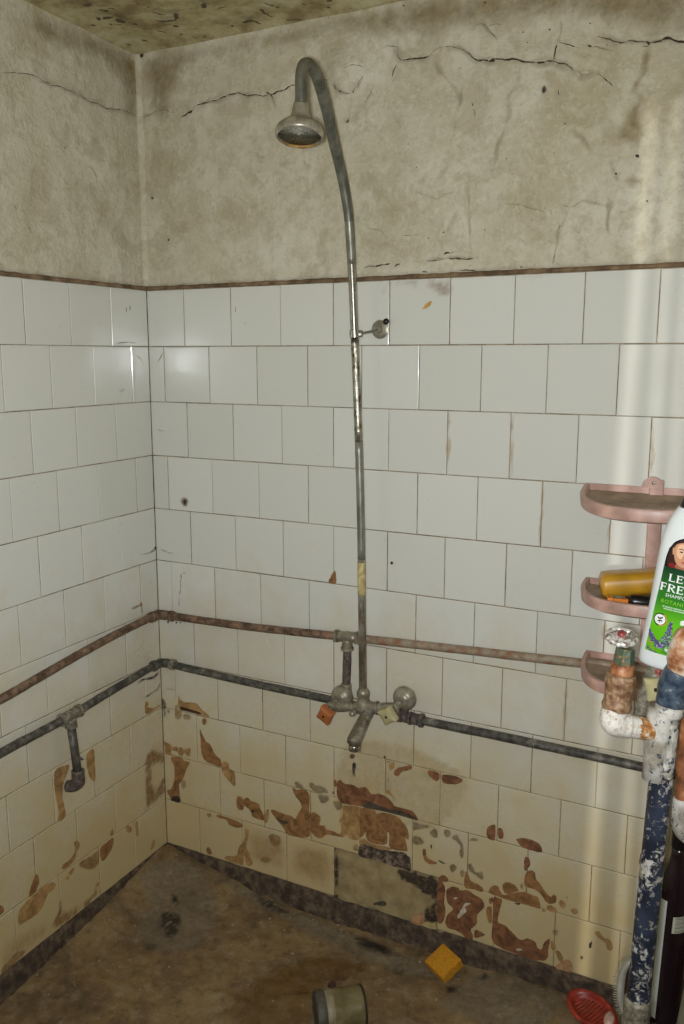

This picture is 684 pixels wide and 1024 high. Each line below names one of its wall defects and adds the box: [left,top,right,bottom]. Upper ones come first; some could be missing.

crack [2,54,295,117]
crack [386,7,684,85]
peeling [18,821,139,925]
peeling [163,695,578,973]